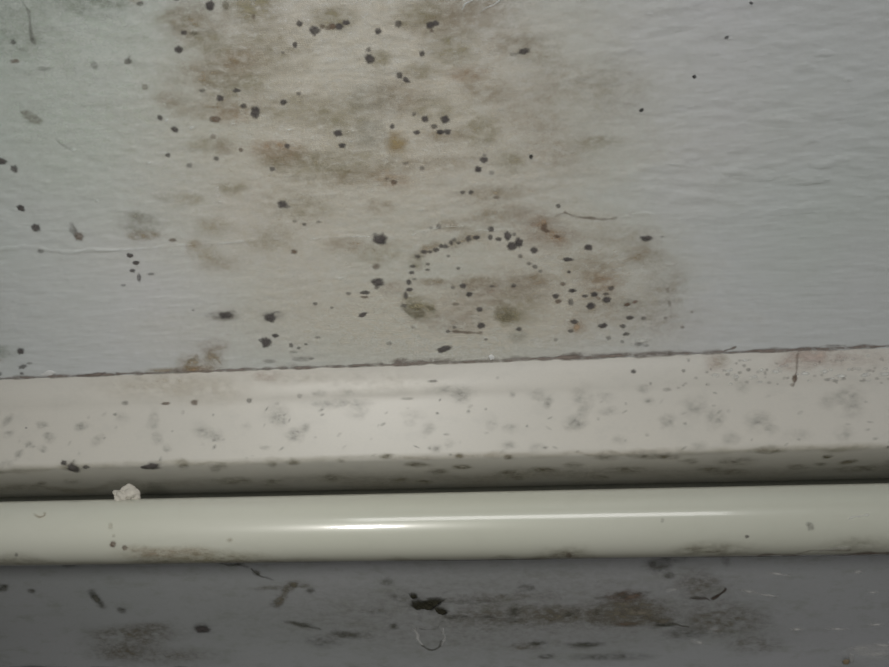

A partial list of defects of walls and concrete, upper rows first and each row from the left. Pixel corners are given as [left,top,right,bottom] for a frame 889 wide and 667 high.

damp [206,0,269,21]
damp [241,55,360,171]
damp [260,0,467,163]
damp [403,227,537,353]
damp [553,268,613,309]